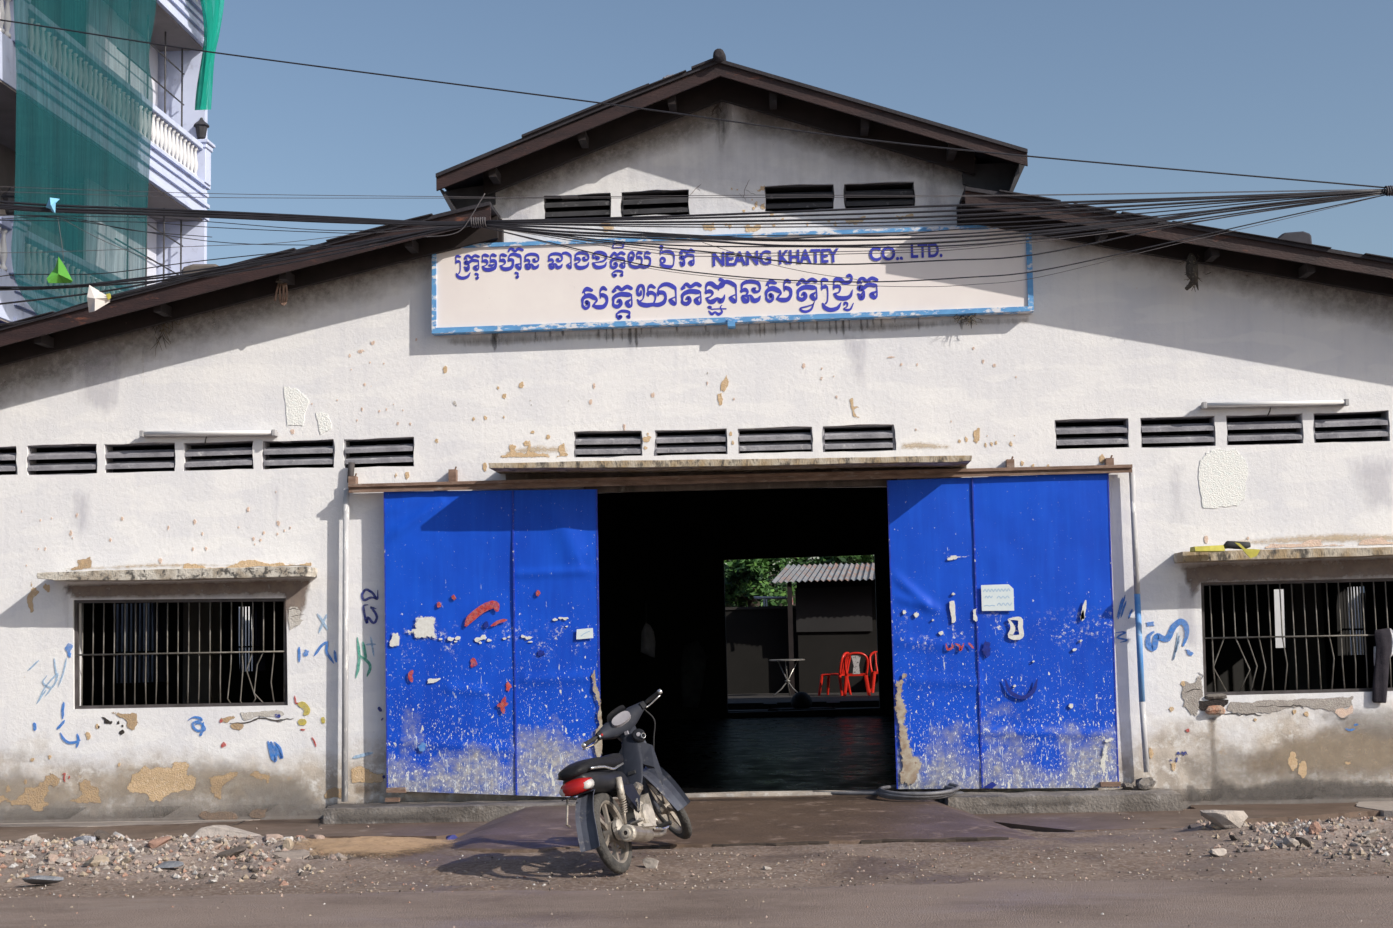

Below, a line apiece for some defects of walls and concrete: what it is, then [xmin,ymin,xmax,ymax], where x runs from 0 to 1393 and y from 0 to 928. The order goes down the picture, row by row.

peeling [483,431,568,471]
peeling [1169,676,1353,721]
peeling [85,712,139,740]
peeling [0,755,60,812]
peeling [117,762,271,820]
leakage [1189,722,1393,802]
peeling [1288,751,1307,778]